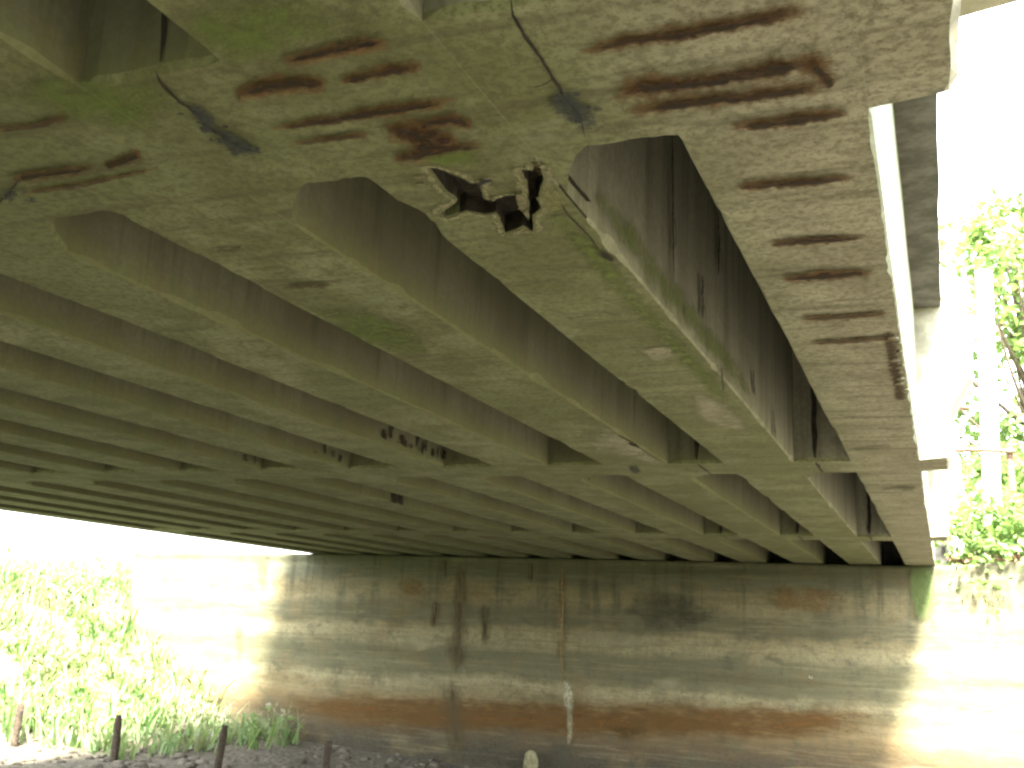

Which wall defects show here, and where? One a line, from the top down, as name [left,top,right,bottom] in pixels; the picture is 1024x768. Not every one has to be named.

corrosion [584,4,800,53]
crack [155,13,260,153]
crack [510,0,586,139]
corrosion [619,53,835,116]
corrosion [276,99,481,163]
corrosion [732,109,846,131]
spalling [414,162,554,236]
spalling [568,175,591,202]
corrosion [742,176,851,191]
corrosion [773,236,862,246]
damp [558,573,573,741]
corrosion [299,695,859,738]